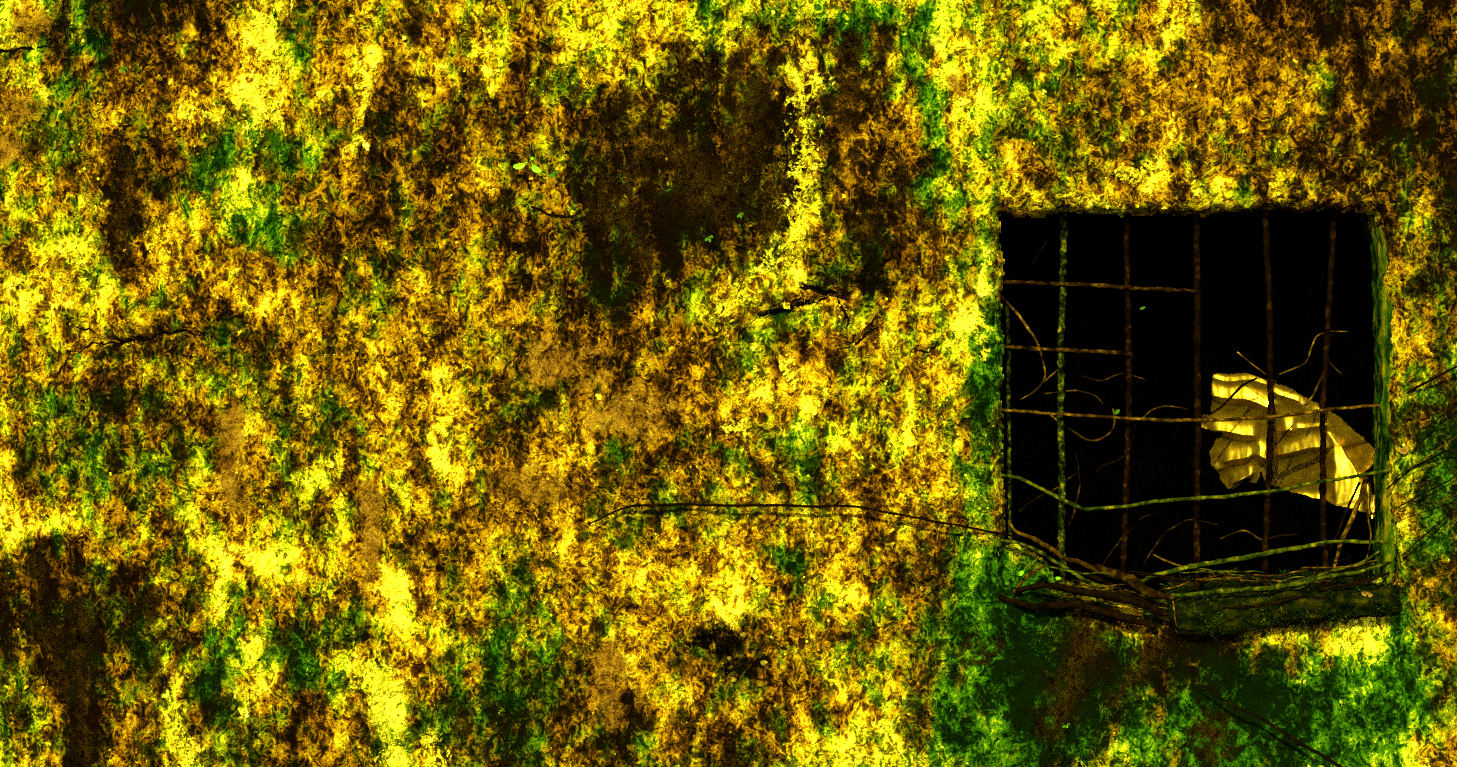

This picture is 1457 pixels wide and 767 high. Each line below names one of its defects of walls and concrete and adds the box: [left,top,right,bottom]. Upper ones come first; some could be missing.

leakage [716,276,766,317]
leakage [573,4,938,307]